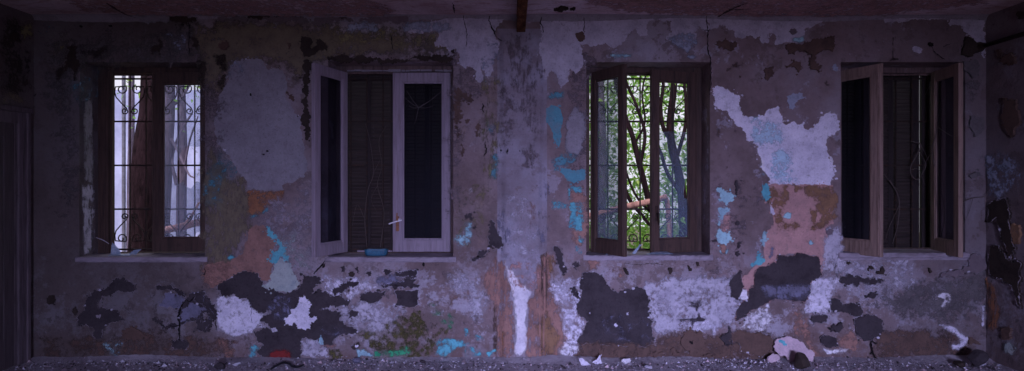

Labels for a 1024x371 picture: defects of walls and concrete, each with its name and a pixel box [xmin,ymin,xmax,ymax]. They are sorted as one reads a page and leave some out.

leakage [0,18,548,268]
peeling [168,16,504,192]
peeling [537,5,887,359]
spalling [72,275,137,339]
spalling [152,226,425,358]
leakage [505,261,532,356]
spalling [985,197,1024,309]